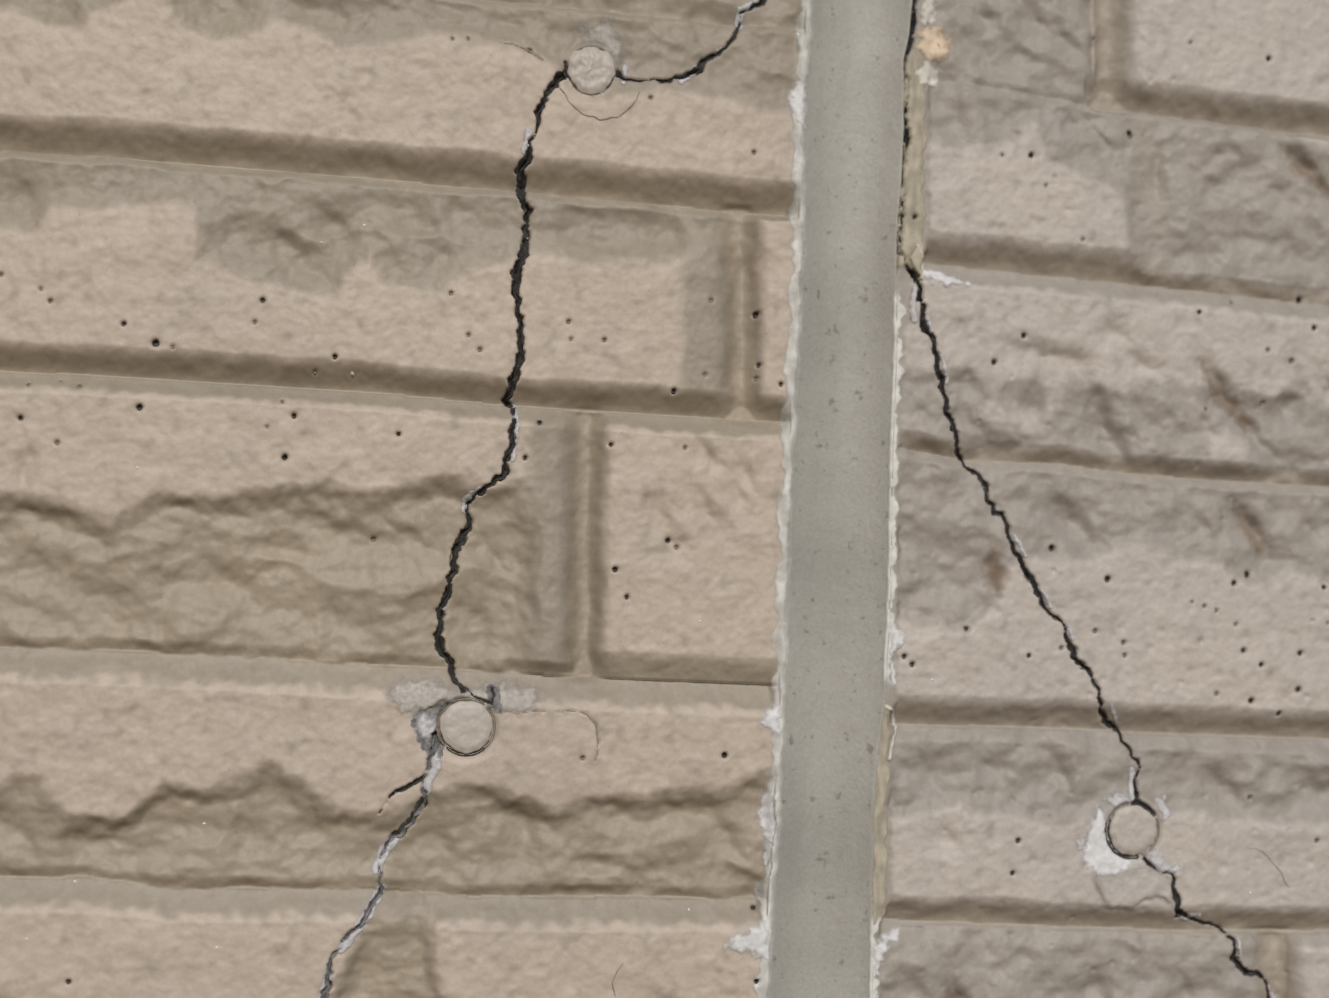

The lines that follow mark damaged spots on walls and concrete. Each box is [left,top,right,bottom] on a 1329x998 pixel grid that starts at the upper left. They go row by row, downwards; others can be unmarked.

crack [434,0,767,761]
crack [897,0,1153,813]
crack [317,735,441,998]
crack [1142,856,1275,998]